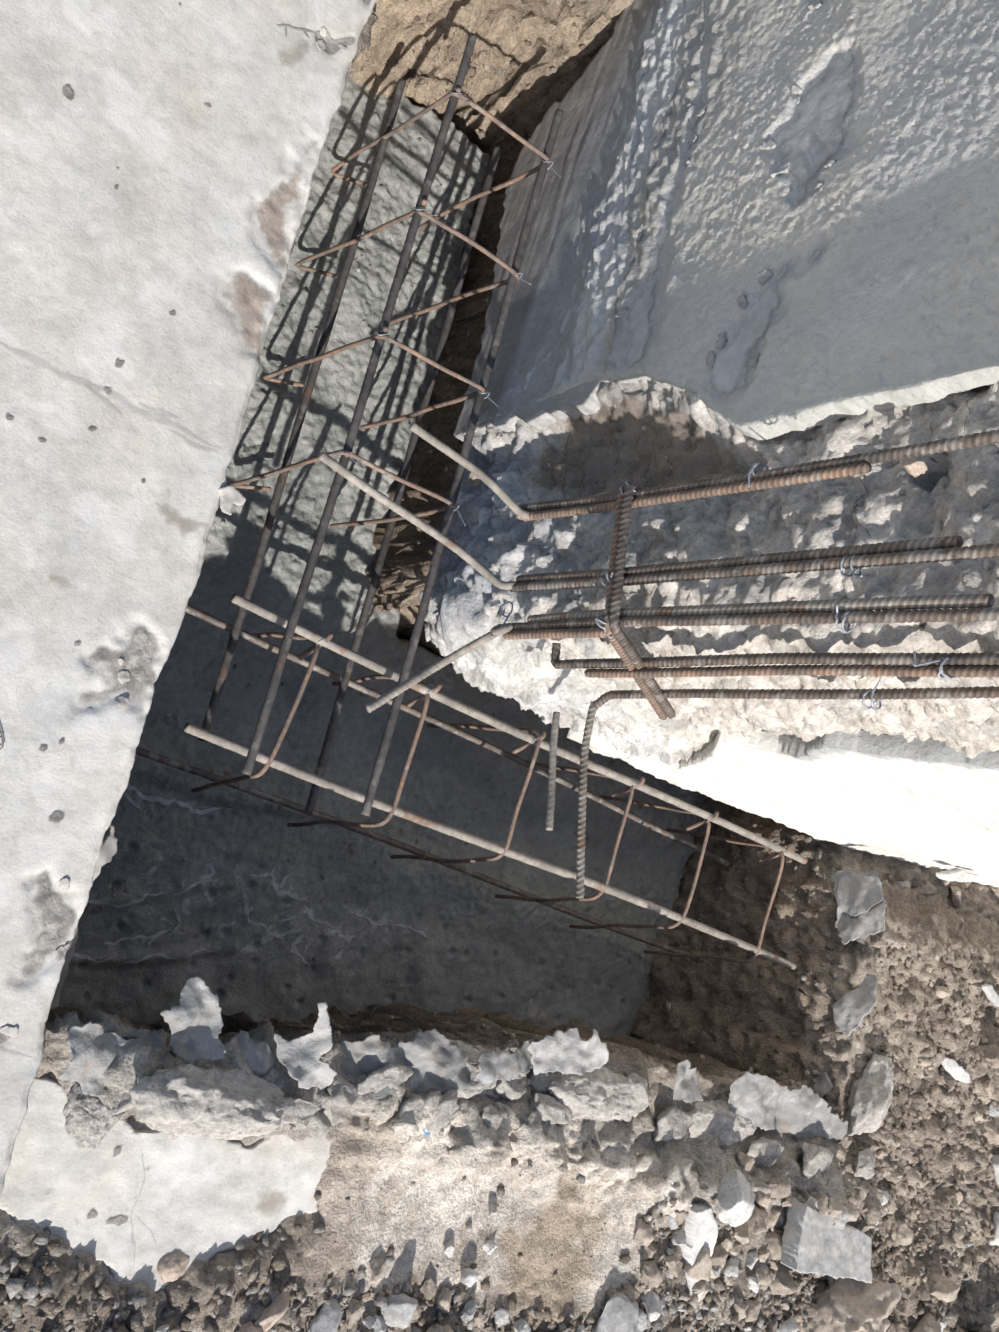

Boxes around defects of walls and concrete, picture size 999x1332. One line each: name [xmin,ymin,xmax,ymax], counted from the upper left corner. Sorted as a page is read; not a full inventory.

peeling [759,56,853,200]
peeling [706,264,789,393]